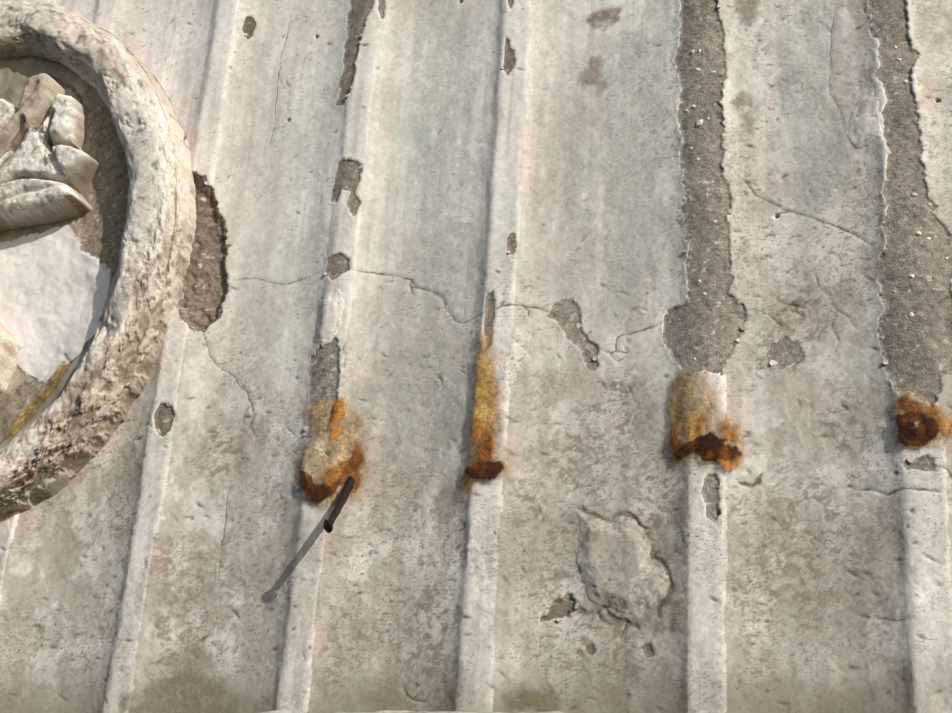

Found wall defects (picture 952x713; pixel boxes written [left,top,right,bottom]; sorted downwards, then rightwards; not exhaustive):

flaking render [336,0,386,105]
flaking render [176,172,232,332]
crack [356,270,552,323]
crack [607,321,663,361]
flaking render [663,0,747,376]
flaking render [868,0,952,409]
corrosion [299,397,368,506]
corrosion [462,332,509,493]
corrosion [668,370,744,470]
corrosion [894,391,952,446]
crack [578,508,673,618]
crack [570,608,633,634]